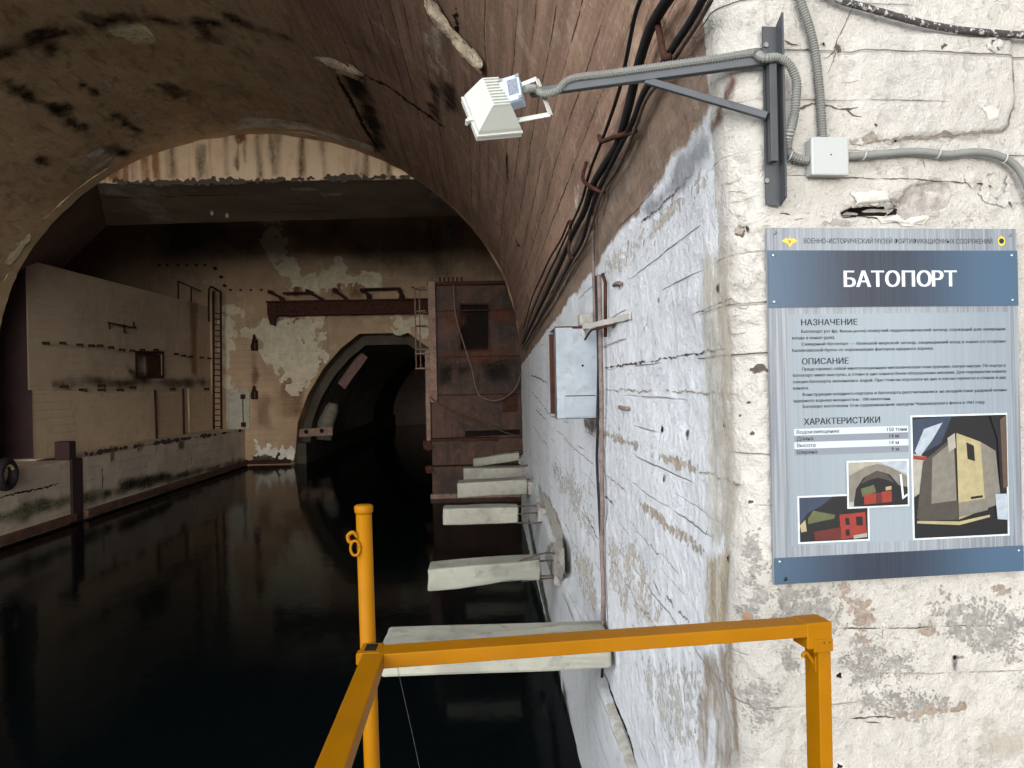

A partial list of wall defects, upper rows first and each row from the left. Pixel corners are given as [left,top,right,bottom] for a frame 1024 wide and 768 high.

spalling [309,55,364,83]
spalling [424,0,483,74]
crack [336,74,445,152]
corrosion [142,153,159,179]
spalling [822,177,951,227]
peeling [258,221,382,295]
peeling [217,304,330,396]
crack [604,297,756,396]
water stain [83,439,296,503]
water stain [0,499,69,521]
peeling [545,462,666,628]